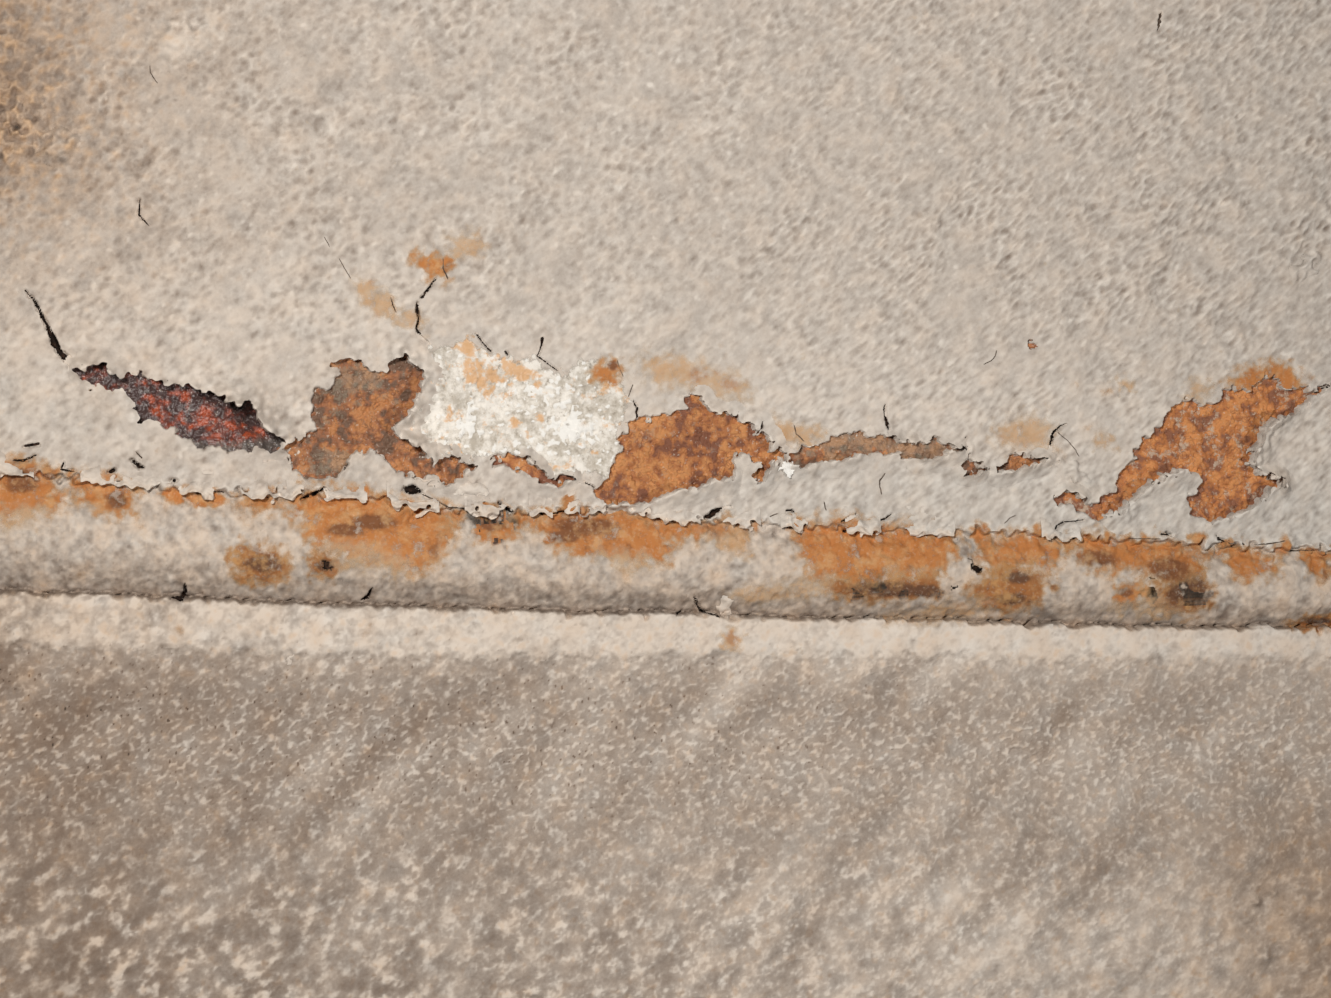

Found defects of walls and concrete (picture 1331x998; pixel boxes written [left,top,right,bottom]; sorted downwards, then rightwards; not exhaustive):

rust [1228,358,1302,392]
peeling [64,329,1324,542]
peeling [0,450,34,478]
crack [1217,537,1312,551]
crack [968,558,982,573]
crack [171,585,187,601]
crack [676,597,719,617]